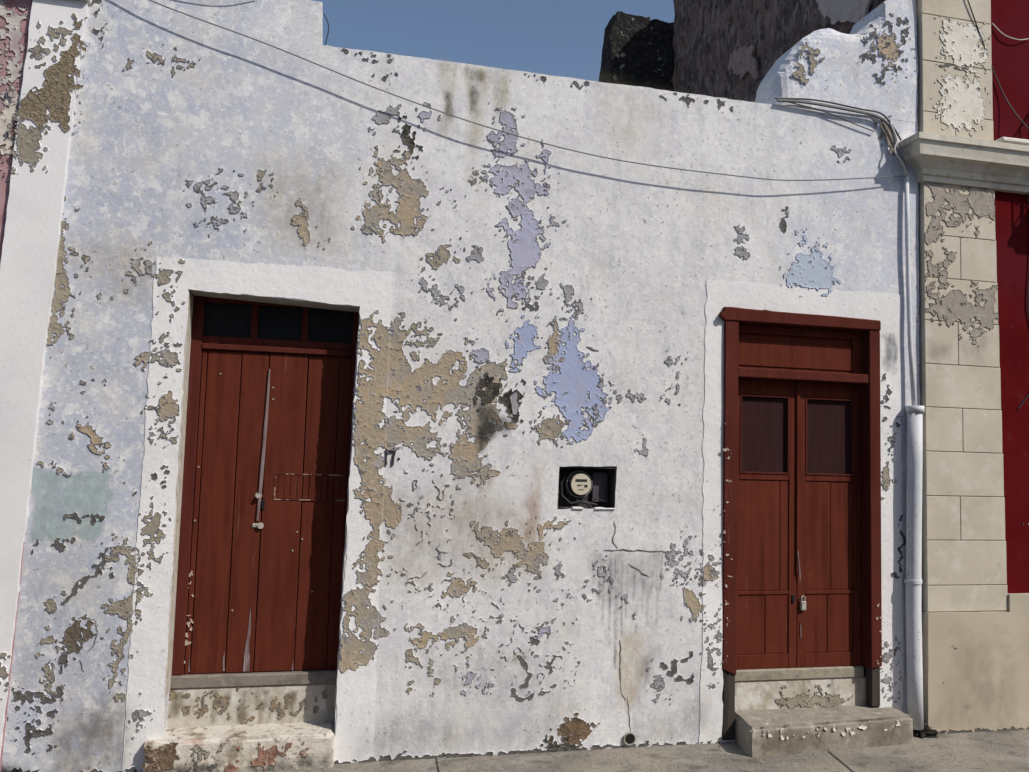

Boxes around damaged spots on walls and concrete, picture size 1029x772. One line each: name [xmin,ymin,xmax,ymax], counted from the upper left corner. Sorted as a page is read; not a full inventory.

spalling [0,0,107,181]
spalling [792,42,825,86]
peeling [931,14,991,136]
peeling [925,181,999,347]
leakage [479,408,503,446]
spalling [339,102,647,706]
peeling [660,350,689,405]
peeling [881,373,903,499]
spalling [0,465,172,754]
spalling [169,686,327,724]
crack [334,643,721,764]
spalling [548,712,600,751]